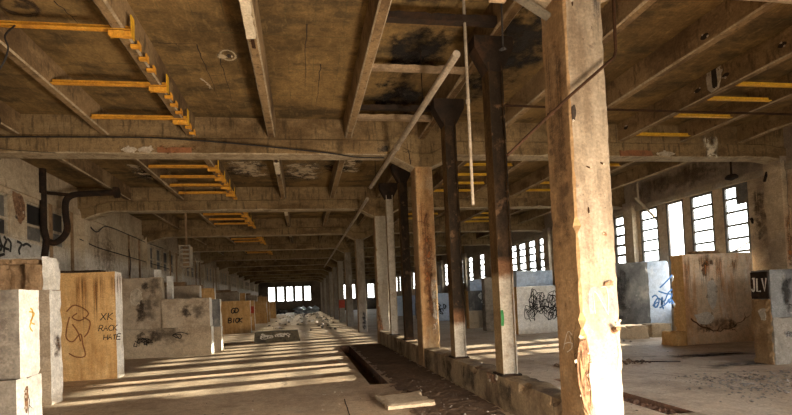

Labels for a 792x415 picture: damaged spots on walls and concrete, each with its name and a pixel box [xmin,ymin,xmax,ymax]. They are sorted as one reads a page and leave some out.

damp [392,35,447,65]
spalling [574,335,594,414]